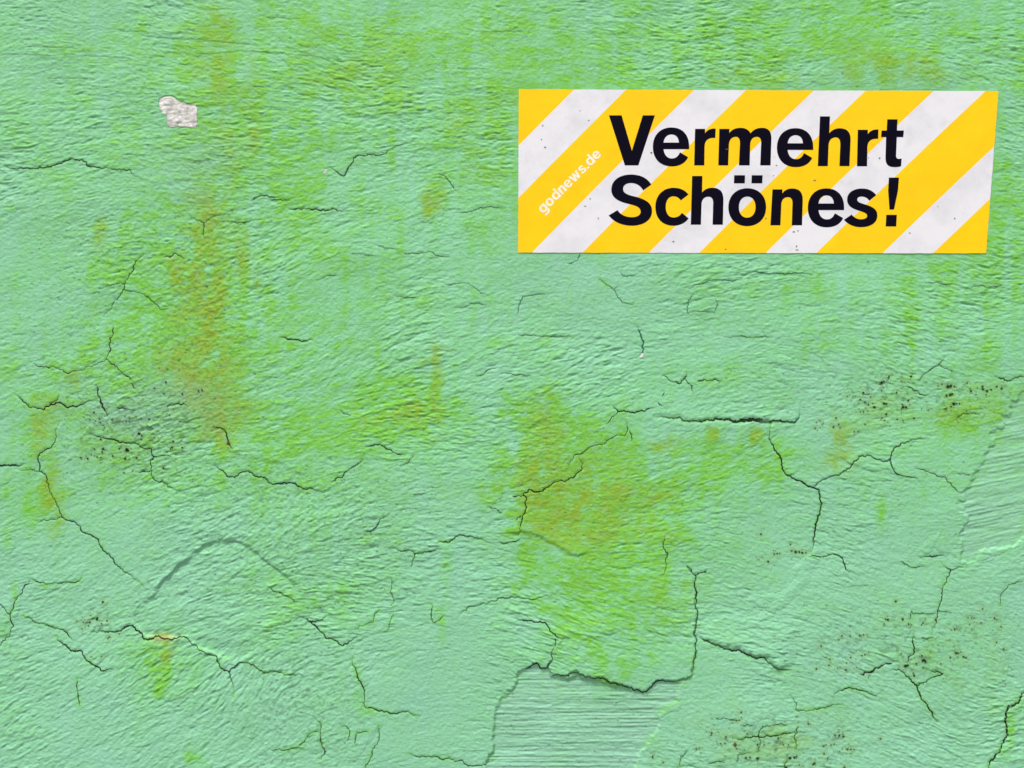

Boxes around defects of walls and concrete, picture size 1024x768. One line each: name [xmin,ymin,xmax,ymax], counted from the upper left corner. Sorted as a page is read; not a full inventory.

peeling [159,97,197,128]
crack [0,579,108,703]
crack [0,253,183,577]
crack [101,625,295,683]
leakage [7,324,463,548]
crack [270,583,410,768]
spalling [484,565,698,768]
leakage [433,375,929,705]
crack [399,375,969,570]
crack [663,538,786,670]
crack [679,555,962,768]
crack [988,692,1024,767]